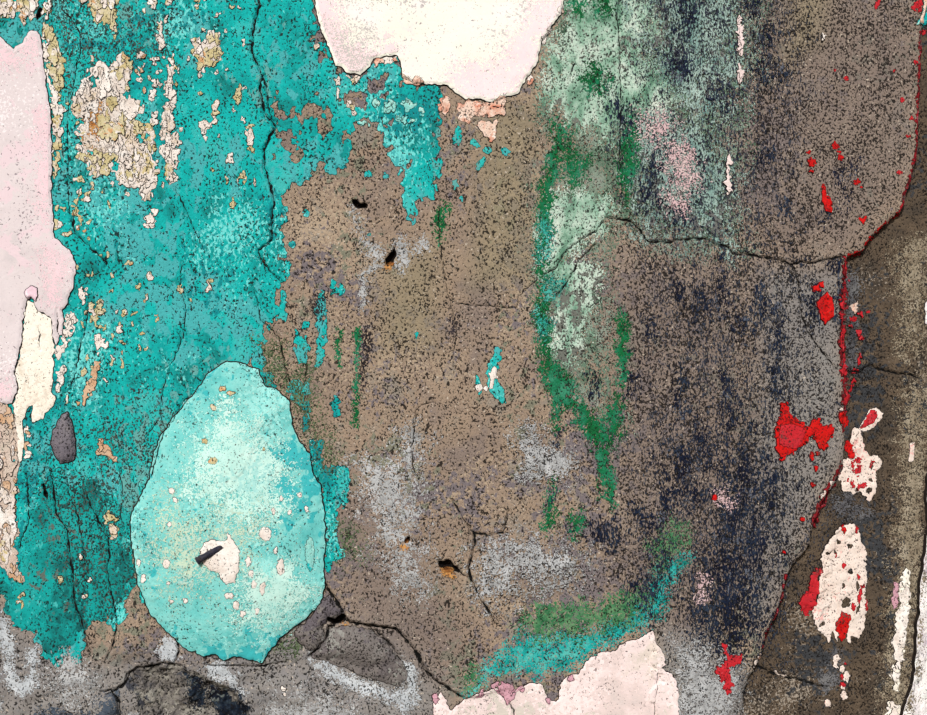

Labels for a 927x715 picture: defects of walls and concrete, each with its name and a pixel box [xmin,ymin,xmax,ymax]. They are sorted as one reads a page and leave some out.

crack [251,0,279,280]
crack [254,291,308,389]
peeling [0,0,564,667]
crack [438,195,921,379]
peeling [714,0,927,715]
crack [454,503,508,623]
crack [104,639,180,715]
crack [205,660,284,668]
crack [310,580,462,697]